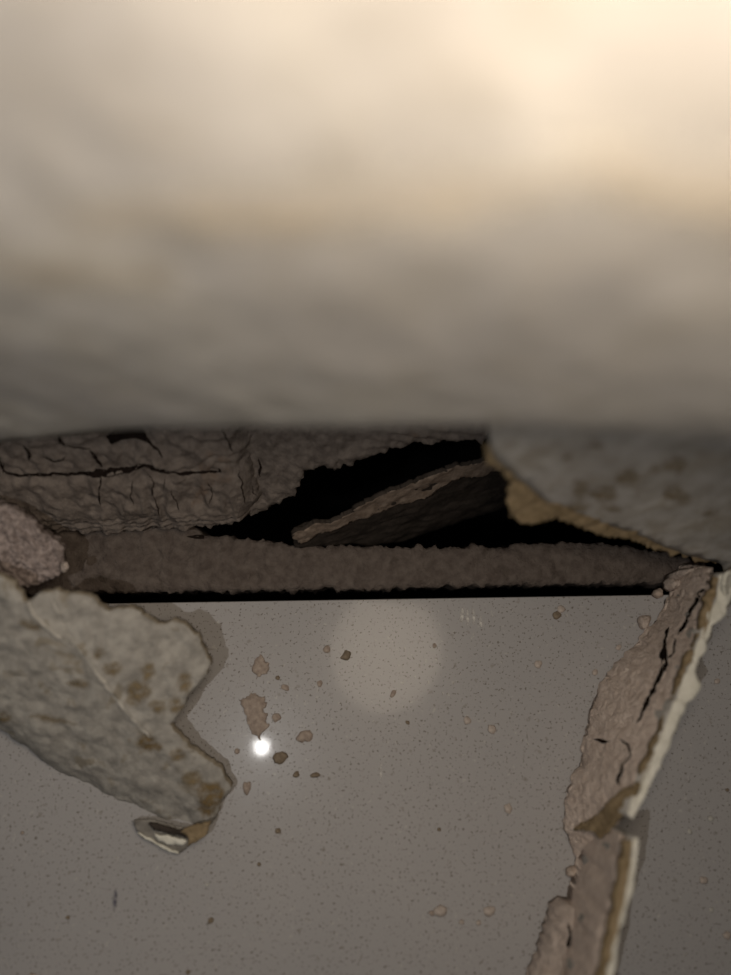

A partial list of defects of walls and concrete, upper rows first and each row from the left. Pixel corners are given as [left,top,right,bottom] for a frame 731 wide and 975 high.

crack [0,428,262,514]